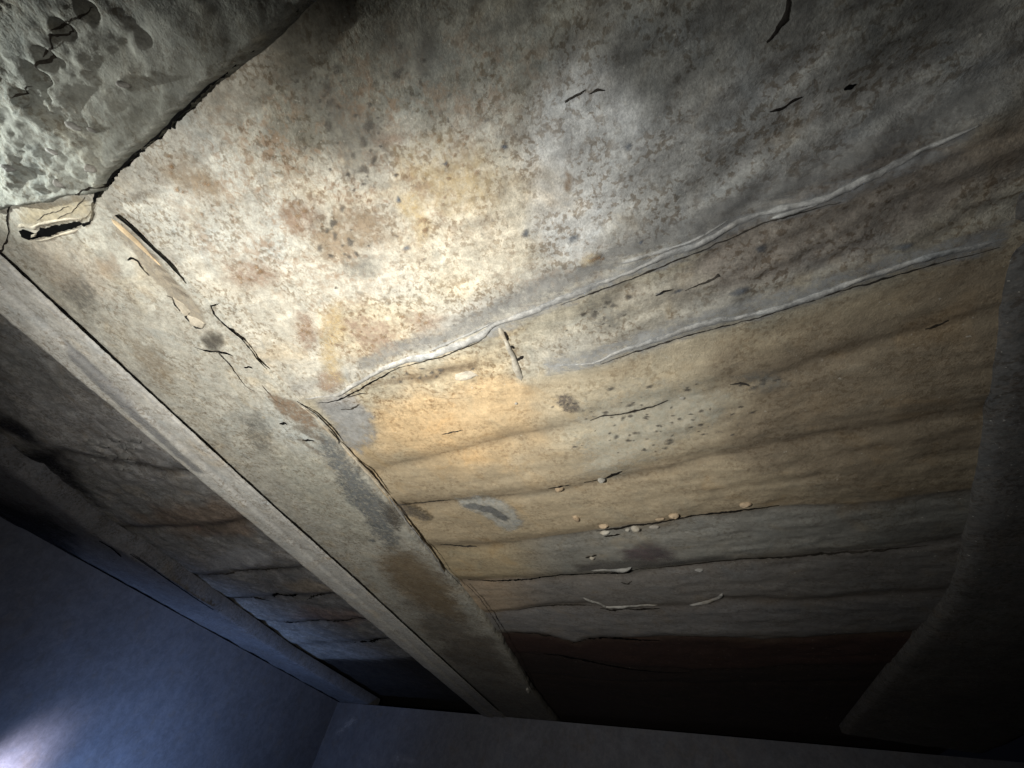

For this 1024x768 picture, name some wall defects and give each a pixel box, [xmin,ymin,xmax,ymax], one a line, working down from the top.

crack [766,0,791,43]
crack [75,50,255,227]
spalling [17,197,89,242]
crack [0,206,499,711]
damp [322,405,397,551]
damp [459,496,522,531]
crack [168,296,926,689]
damp [560,382,754,471]